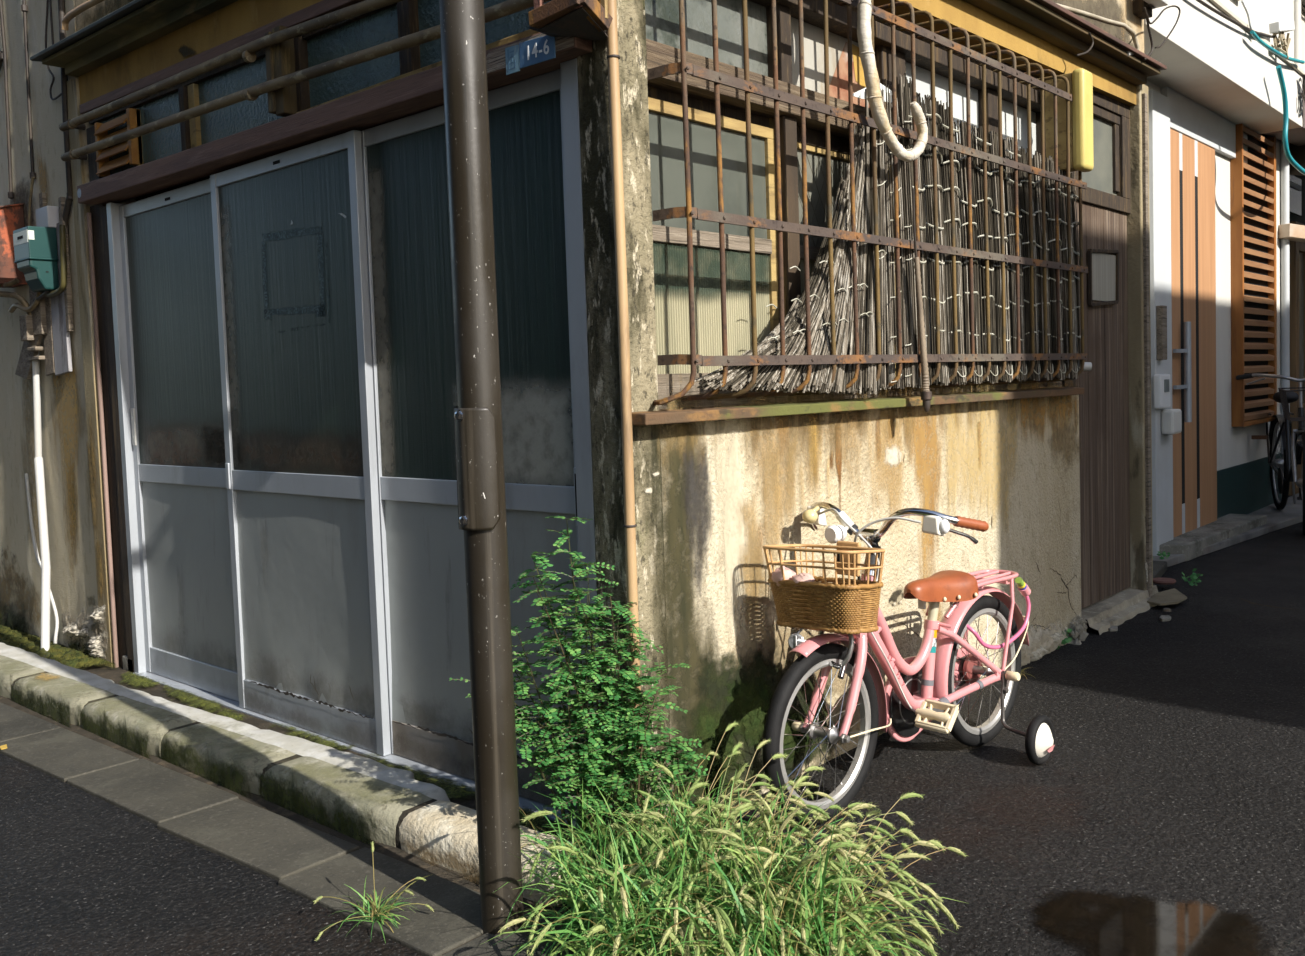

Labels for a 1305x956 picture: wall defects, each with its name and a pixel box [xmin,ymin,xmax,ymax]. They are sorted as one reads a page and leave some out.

leakage [1051,0,1141,48]
leakage [52,368,78,552]
rust [815,410,895,499]
leakage [894,381,1079,578]
leakage [0,555,40,623]
leakage [652,398,718,772]